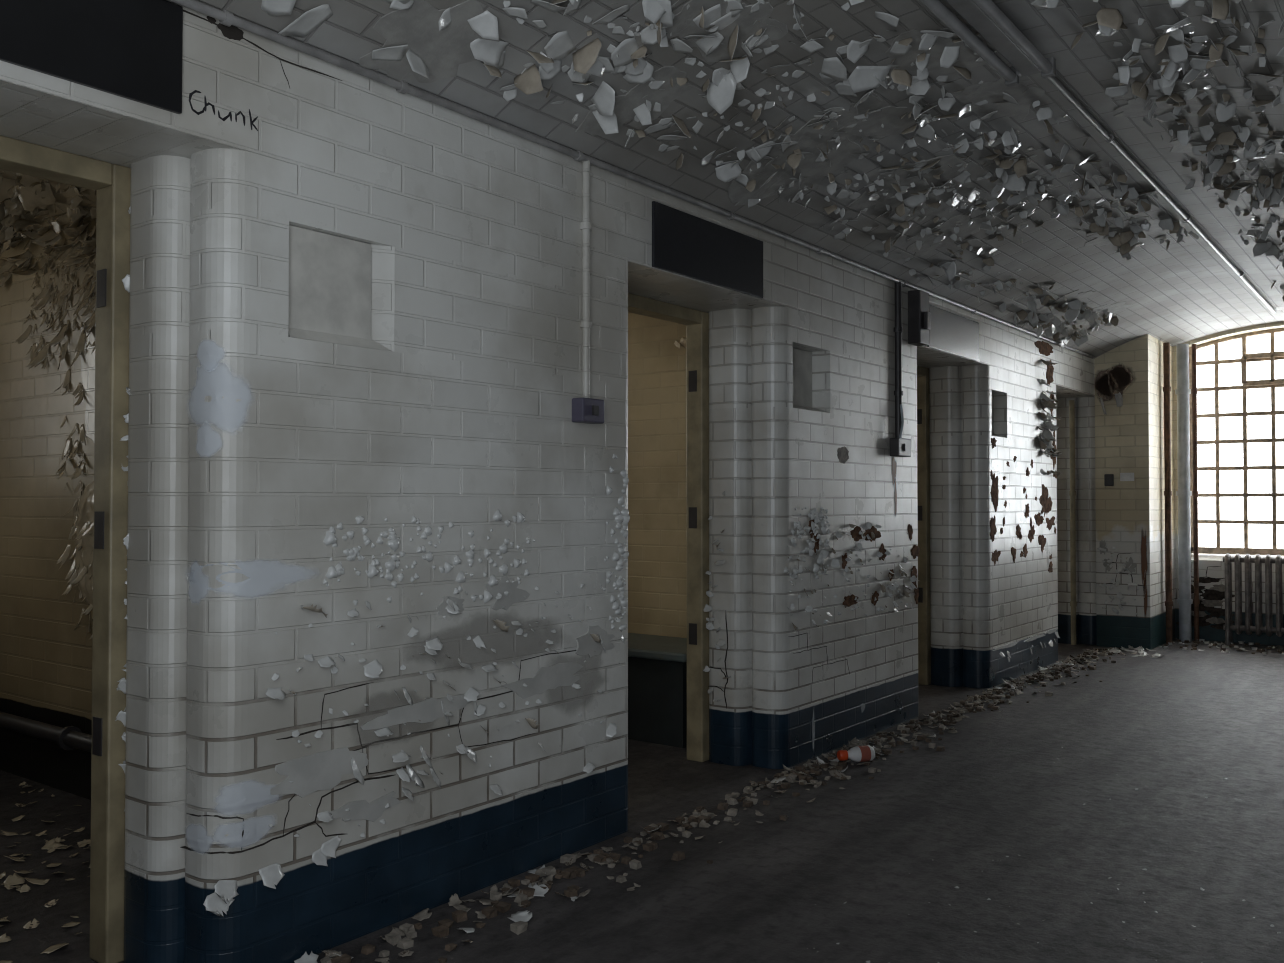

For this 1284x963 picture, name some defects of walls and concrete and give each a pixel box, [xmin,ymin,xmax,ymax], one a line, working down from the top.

peeling [0,169,97,495]
peeling [261,0,333,38]
peeling [359,0,1200,573]
peeling [1071,0,1284,310]
peeling [266,575,625,866]
peeling [787,519,920,631]
peeling [203,880,239,917]
peeling [258,863,285,889]